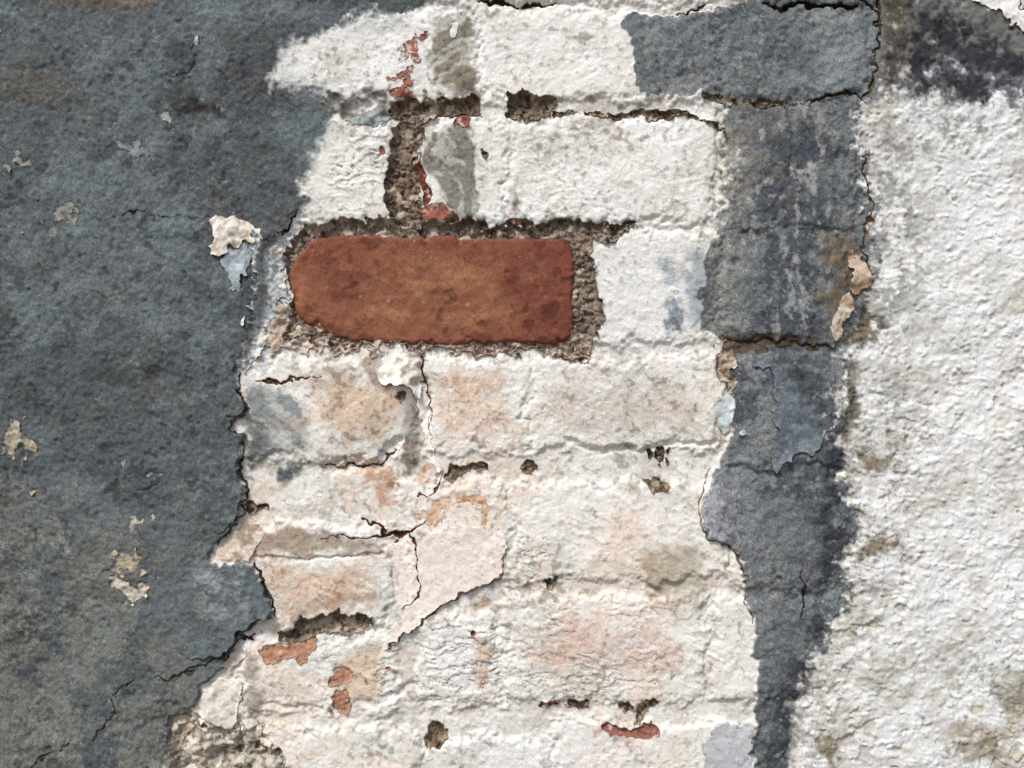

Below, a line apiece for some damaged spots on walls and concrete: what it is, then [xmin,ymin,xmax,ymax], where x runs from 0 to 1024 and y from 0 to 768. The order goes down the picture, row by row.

crack [762,0,882,106]
leakage [885,0,1024,108]
crack [860,149,875,276]
spalling [209,151,638,480]
peeling [830,249,875,341]
spalling [710,334,747,436]
leakage [842,360,860,441]
crack [217,372,322,546]
crack [325,448,397,468]
peeling [164,420,374,768]
crack [321,518,508,651]
peeling [601,721,660,739]